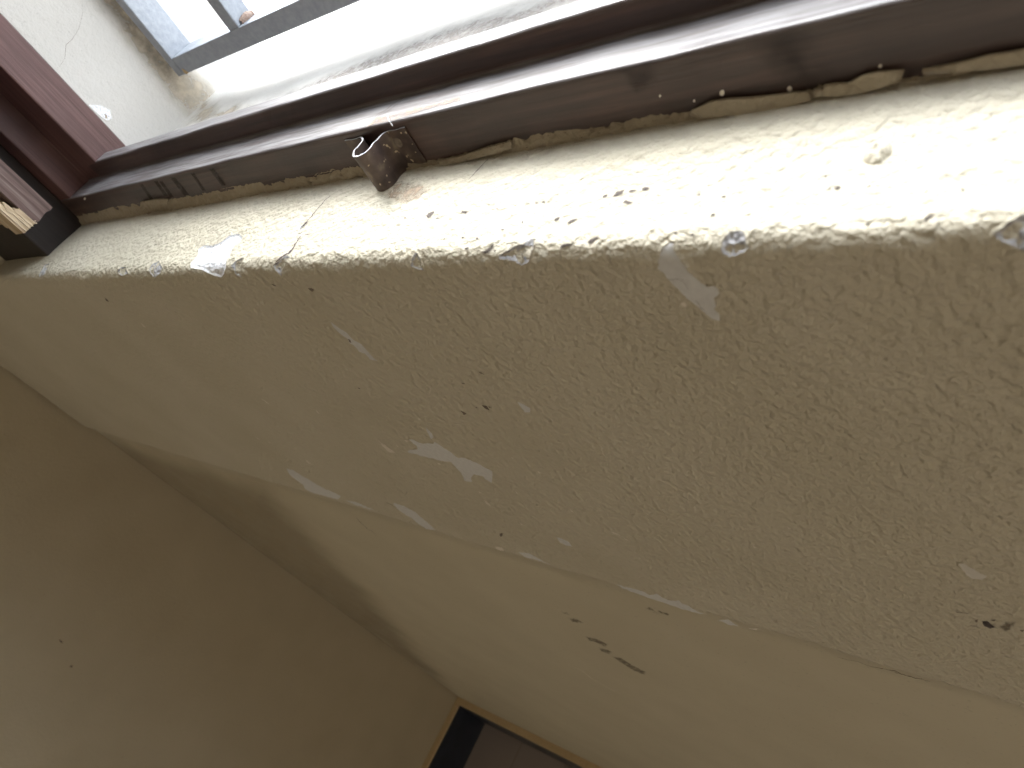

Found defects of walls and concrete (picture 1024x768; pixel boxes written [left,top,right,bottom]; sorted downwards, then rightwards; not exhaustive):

spalling [190,233,245,278]
crack [273,200,325,289]
spalling [462,237,539,267]
peeling [655,232,723,322]
peeling [379,426,494,483]
peeling [286,468,437,531]